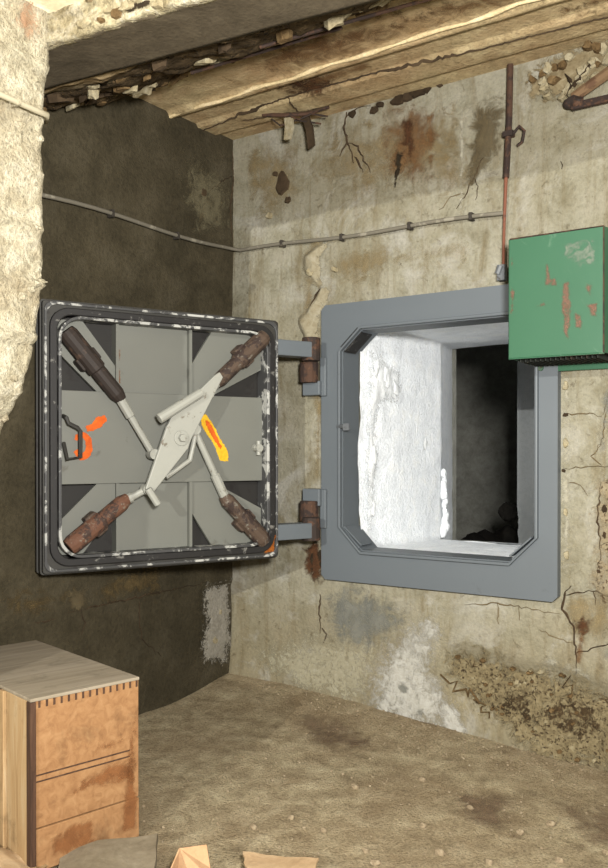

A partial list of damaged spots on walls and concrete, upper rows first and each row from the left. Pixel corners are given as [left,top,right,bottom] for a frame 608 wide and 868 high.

spalling [43,0,431,112]
crack [202,17,608,131]
spalling [525,40,608,103]
crack [340,106,371,173]
damp [326,106,505,185]
corrosion [304,542,321,581]
flaking render [590,480,608,603]
crack [318,595,327,643]
damp [259,589,467,732]
crack [467,586,608,673]
corrosion [570,599,606,662]
spalling [440,647,608,772]